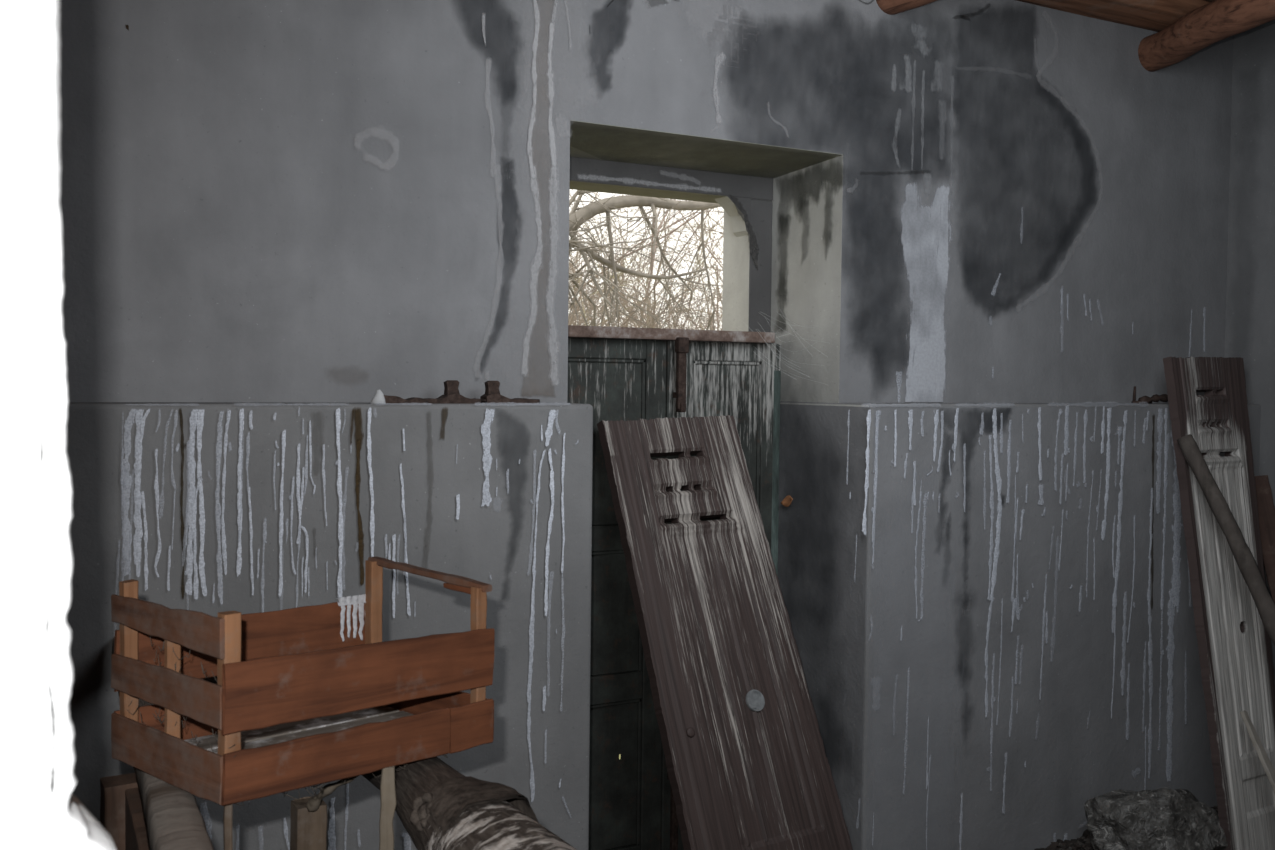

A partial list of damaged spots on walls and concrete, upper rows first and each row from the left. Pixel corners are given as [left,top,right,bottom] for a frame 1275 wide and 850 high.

damp [461,0,515,98]
damp [591,0,627,88]
damp [500,162,520,261]
damp [121,408,352,612]
damp [367,407,416,618]
damp [481,409,520,507]
damp [522,0,565,802]
damp [714,10,1192,813]